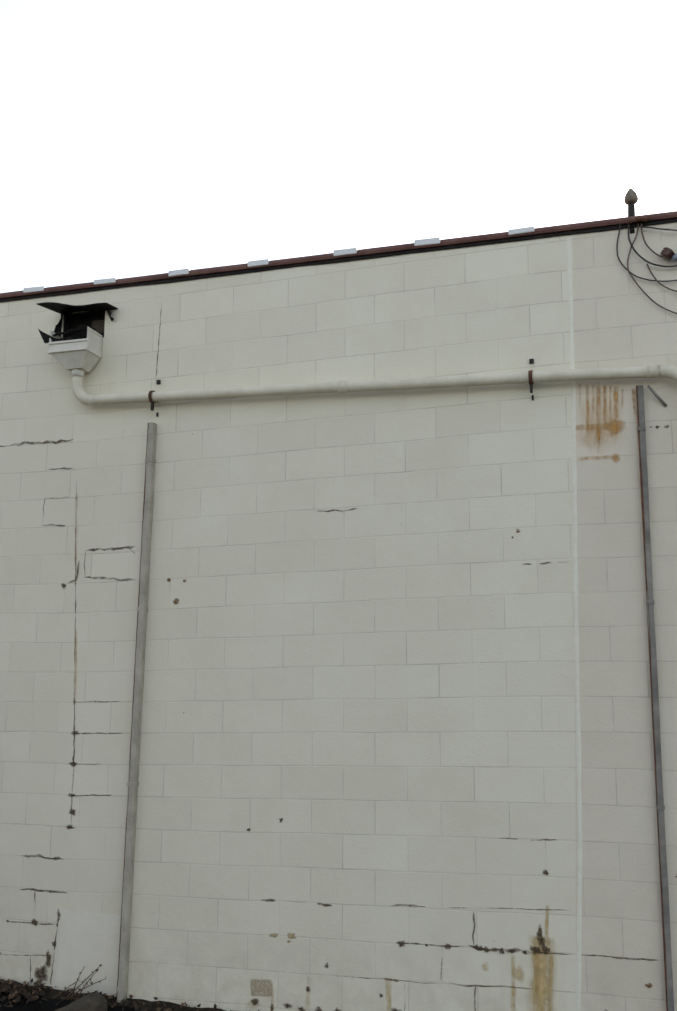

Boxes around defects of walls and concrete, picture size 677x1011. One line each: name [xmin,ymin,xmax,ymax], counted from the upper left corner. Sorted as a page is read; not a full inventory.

crack [0,439,71,447]
rust [587,386,620,439]
crack [43,501,134,660]
crack [73,700,119,765]
rust [633,385,668,1011]
crack [358,907,654,1011]